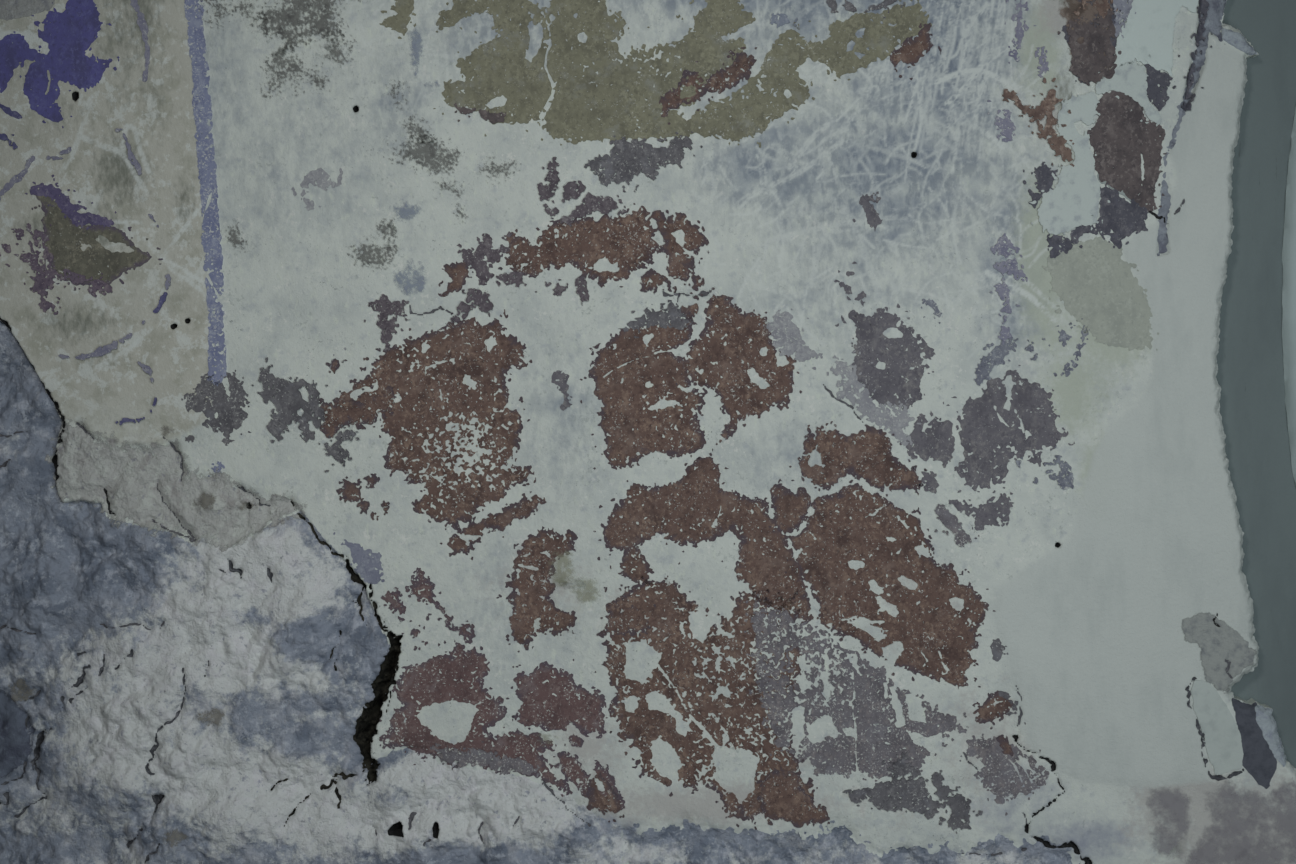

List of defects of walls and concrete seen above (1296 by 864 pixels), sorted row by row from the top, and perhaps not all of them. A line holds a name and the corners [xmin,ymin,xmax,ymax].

peeling [380,0,416,39]
peeling [436,0,942,192]
peeling [1002,78,1075,210]
peeling [1042,0,1226,377]
crack [0,318,94,489]
crack [0,621,165,818]
crack [126,660,209,863]
crack [152,436,196,542]
crack [219,559,273,583]
crack [237,485,403,827]
spalling [0,157,1074,864]
spalling [1182,613,1277,789]